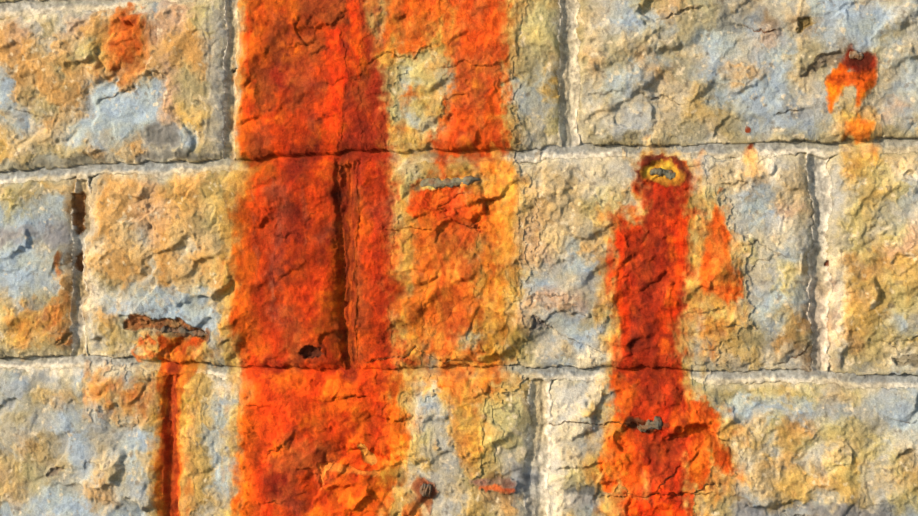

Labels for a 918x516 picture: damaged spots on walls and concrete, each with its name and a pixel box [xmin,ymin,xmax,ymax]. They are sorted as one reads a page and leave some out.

rust [81,0,545,516]
rust [576,132,756,516]
rust [824,42,891,180]